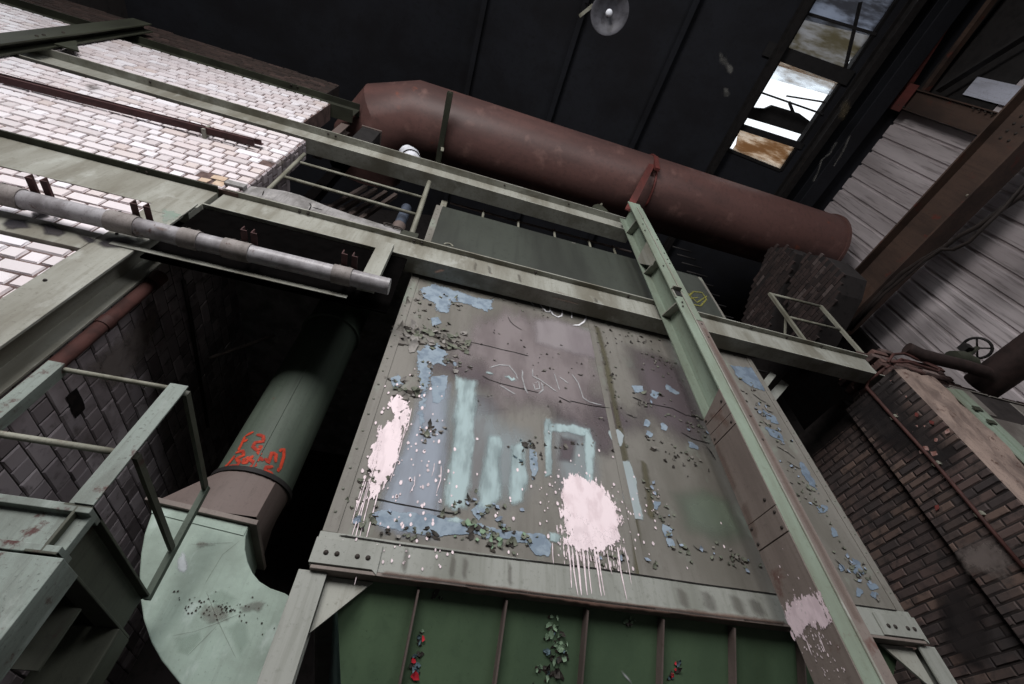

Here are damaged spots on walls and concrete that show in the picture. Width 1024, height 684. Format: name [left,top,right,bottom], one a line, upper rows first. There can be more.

peeling [384,283,560,444]
peeling [594,320,710,477]
peeling [345,469,552,557]
peeling [585,543,630,571]
peeling [642,479,763,573]
peeling [730,365,880,601]